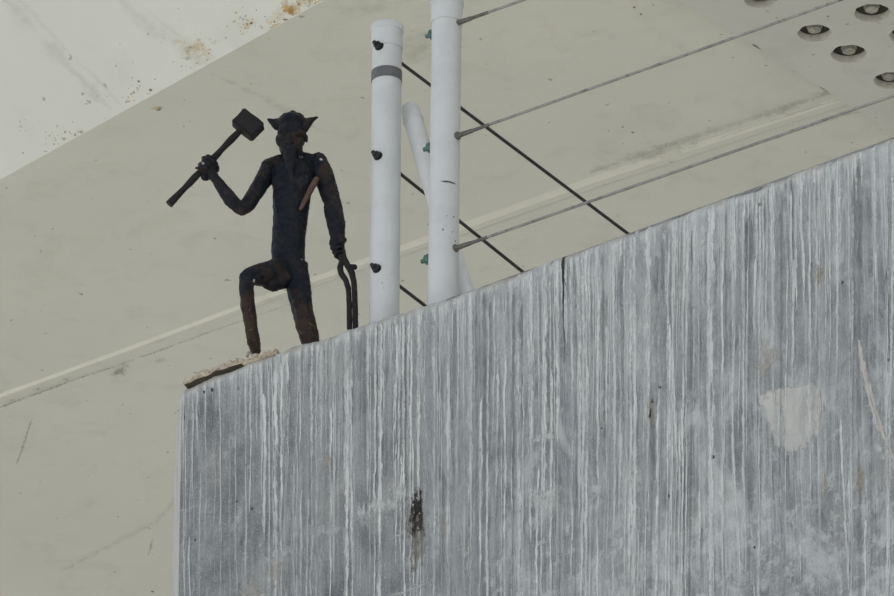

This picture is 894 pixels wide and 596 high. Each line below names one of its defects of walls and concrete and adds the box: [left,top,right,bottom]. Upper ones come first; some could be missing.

corrosion [234,0,319,37]
leakage [234,141,894,596]
peeling [759,384,825,454]
leakage [182,386,206,596]
corrosion [408,489,422,554]